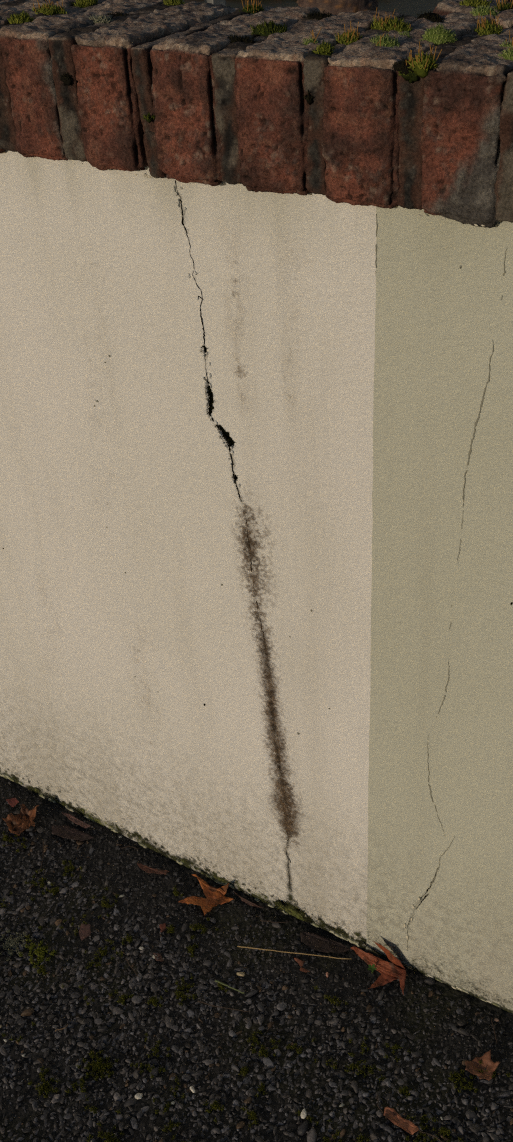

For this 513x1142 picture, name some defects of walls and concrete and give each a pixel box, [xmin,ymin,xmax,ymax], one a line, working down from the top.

crack [173,180,264,637]
crack [457,340,494,561]
water stain [241,506,296,842]
crack [283,813,291,886]
crack [427,665,449,836]